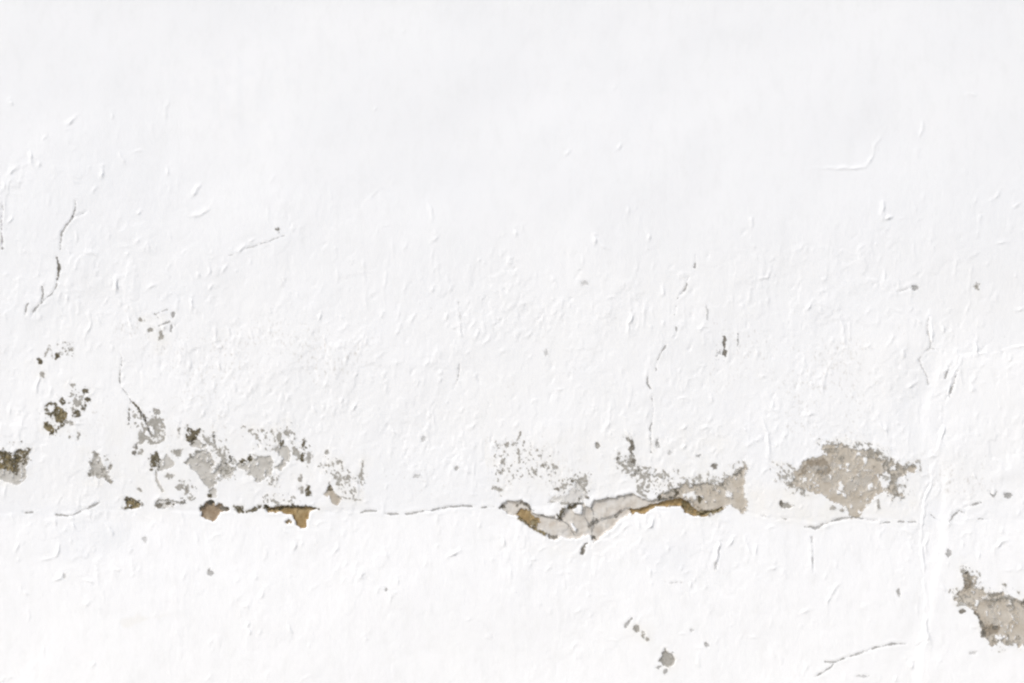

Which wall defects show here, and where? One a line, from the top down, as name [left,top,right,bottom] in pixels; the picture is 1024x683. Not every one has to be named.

peeling [0,441,32,485]
crack [25,502,98,516]
peeling [124,422,365,528]
crack [361,505,487,515]
flaking render [498,461,748,555]
peeling [773,438,921,519]
crack [784,493,996,530]
peeling [948,567,1024,652]